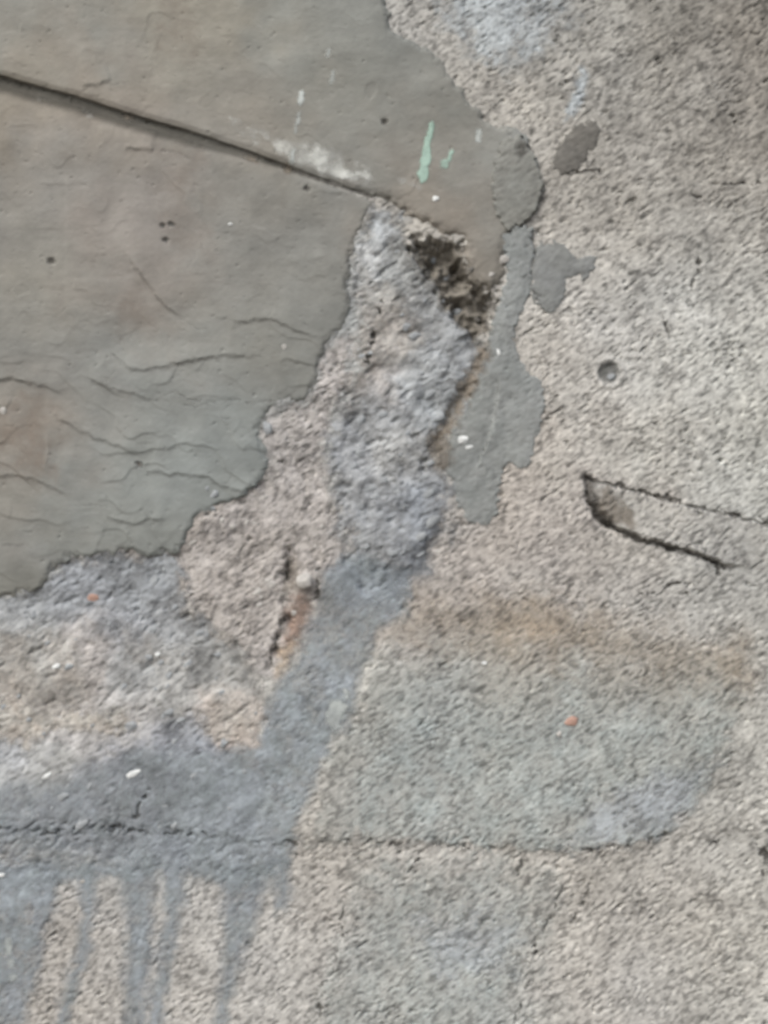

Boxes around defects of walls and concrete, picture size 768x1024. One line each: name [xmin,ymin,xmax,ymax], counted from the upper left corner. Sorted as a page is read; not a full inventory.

spalling [0,212,492,862]
crack [586,480,768,575]
water stain [0,559,407,1024]